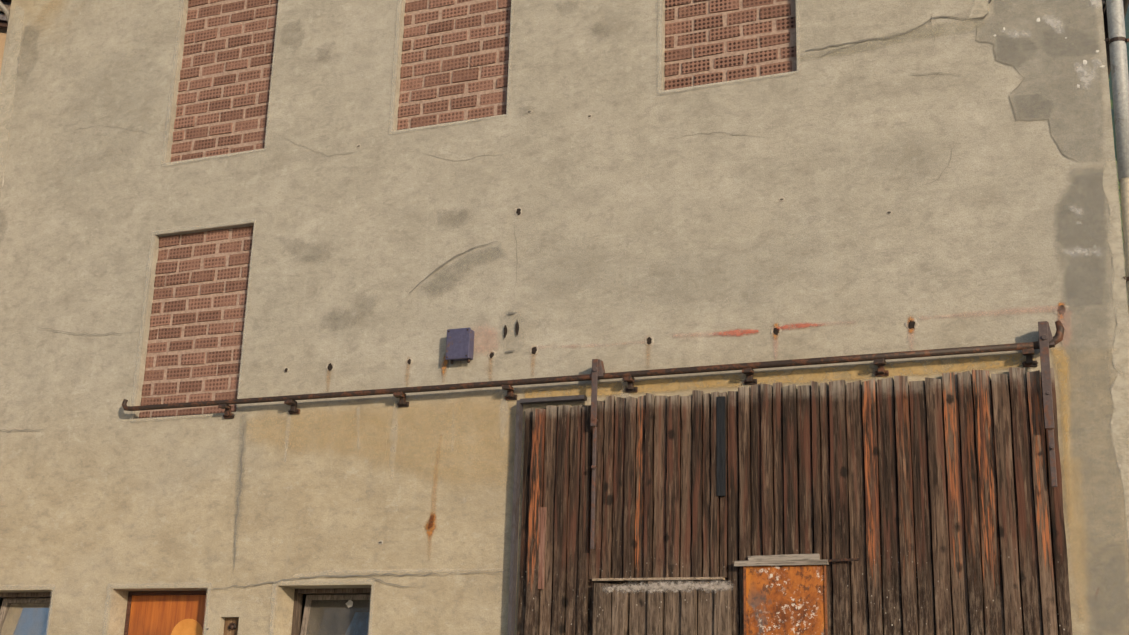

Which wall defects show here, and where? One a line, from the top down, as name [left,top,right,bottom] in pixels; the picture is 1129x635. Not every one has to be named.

crack [806,0,992,58]
corrosion [525,353,1026,398]
corrosion [425,514,436,537]